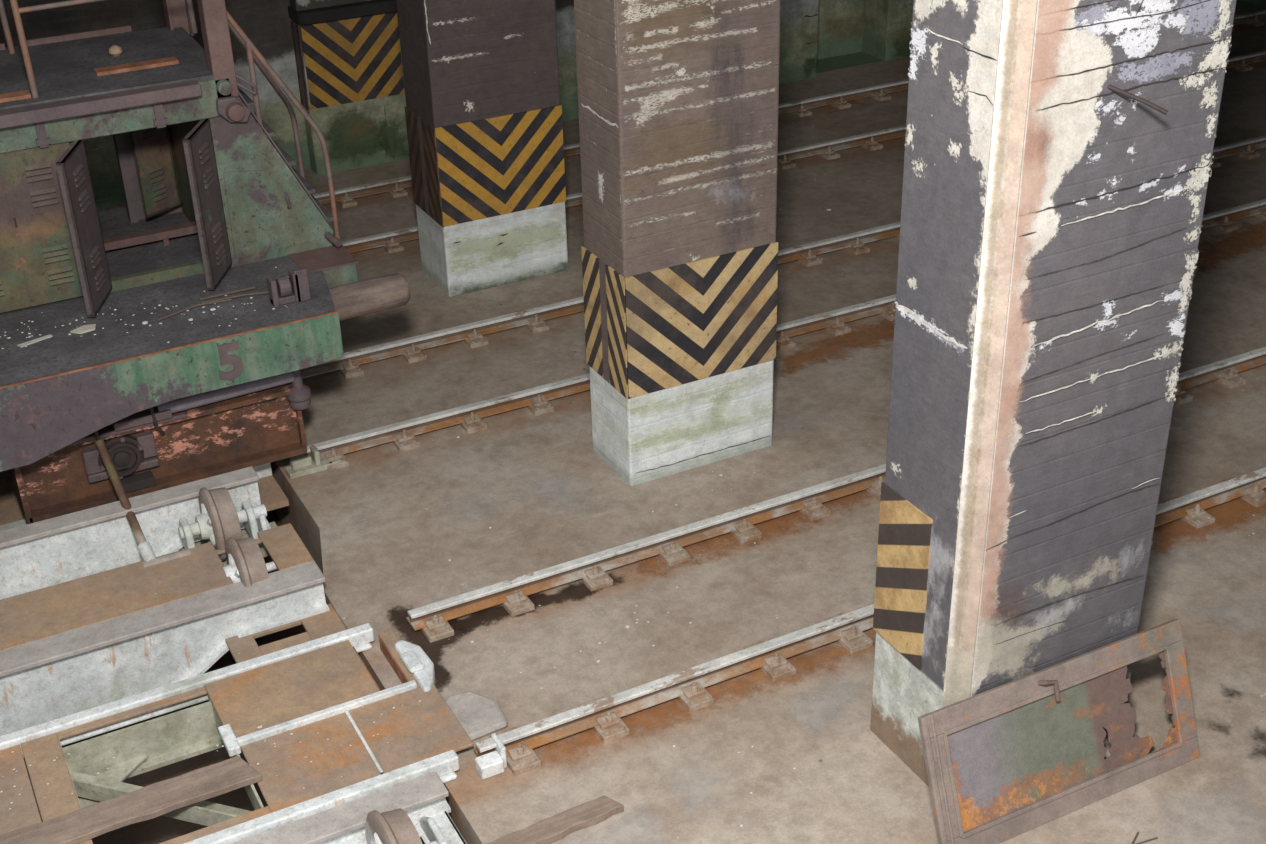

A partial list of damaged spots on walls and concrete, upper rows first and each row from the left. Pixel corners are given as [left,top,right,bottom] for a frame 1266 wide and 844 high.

peeling [613,0,776,80]
corrosion [1012,0,1069,282]
corrosion [980,297,1028,620]
peeling [894,0,1236,708]